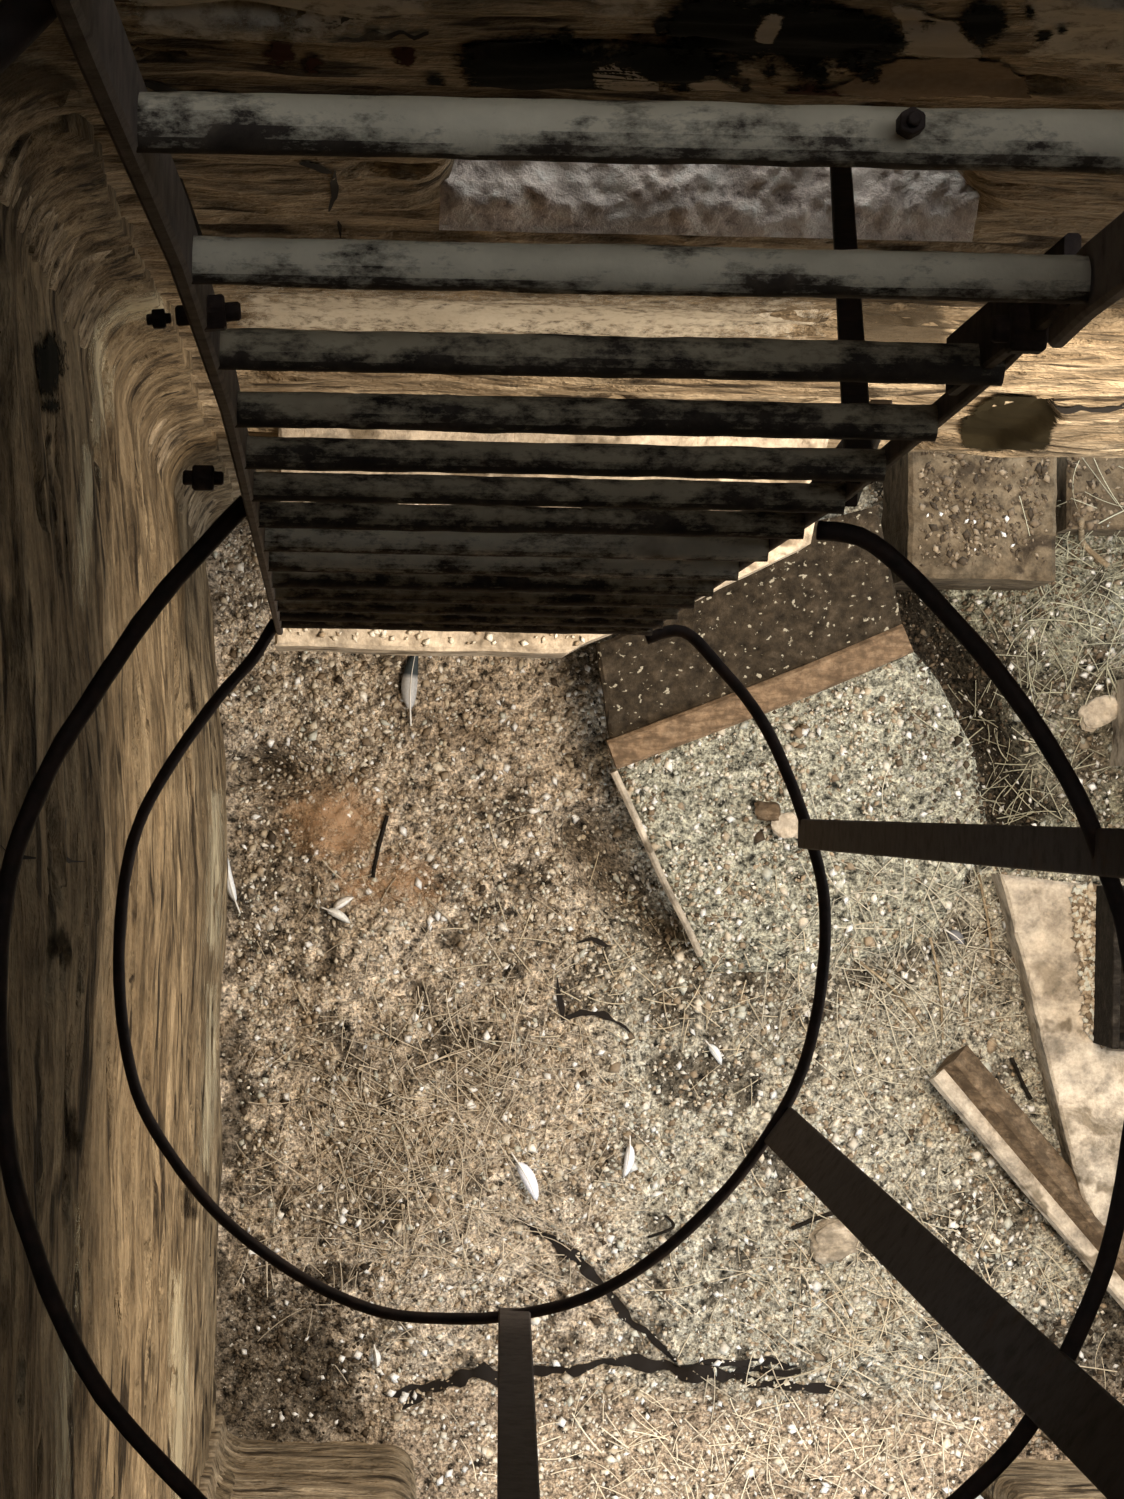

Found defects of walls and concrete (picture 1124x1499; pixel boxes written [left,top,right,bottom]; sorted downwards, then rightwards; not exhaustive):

rust [391,47,417,67]
damp [426,0,934,94]
damp [957,0,1009,53]
damp [1025,5,1068,44]